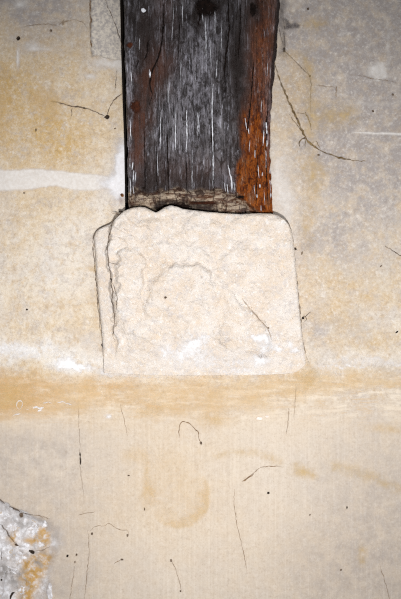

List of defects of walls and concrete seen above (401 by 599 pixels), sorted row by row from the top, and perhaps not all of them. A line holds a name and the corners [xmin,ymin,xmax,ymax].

crack [51,72,121,119]
crack [275,65,364,162]
crack [92,210,124,348]
flaking render [0,499,57,599]